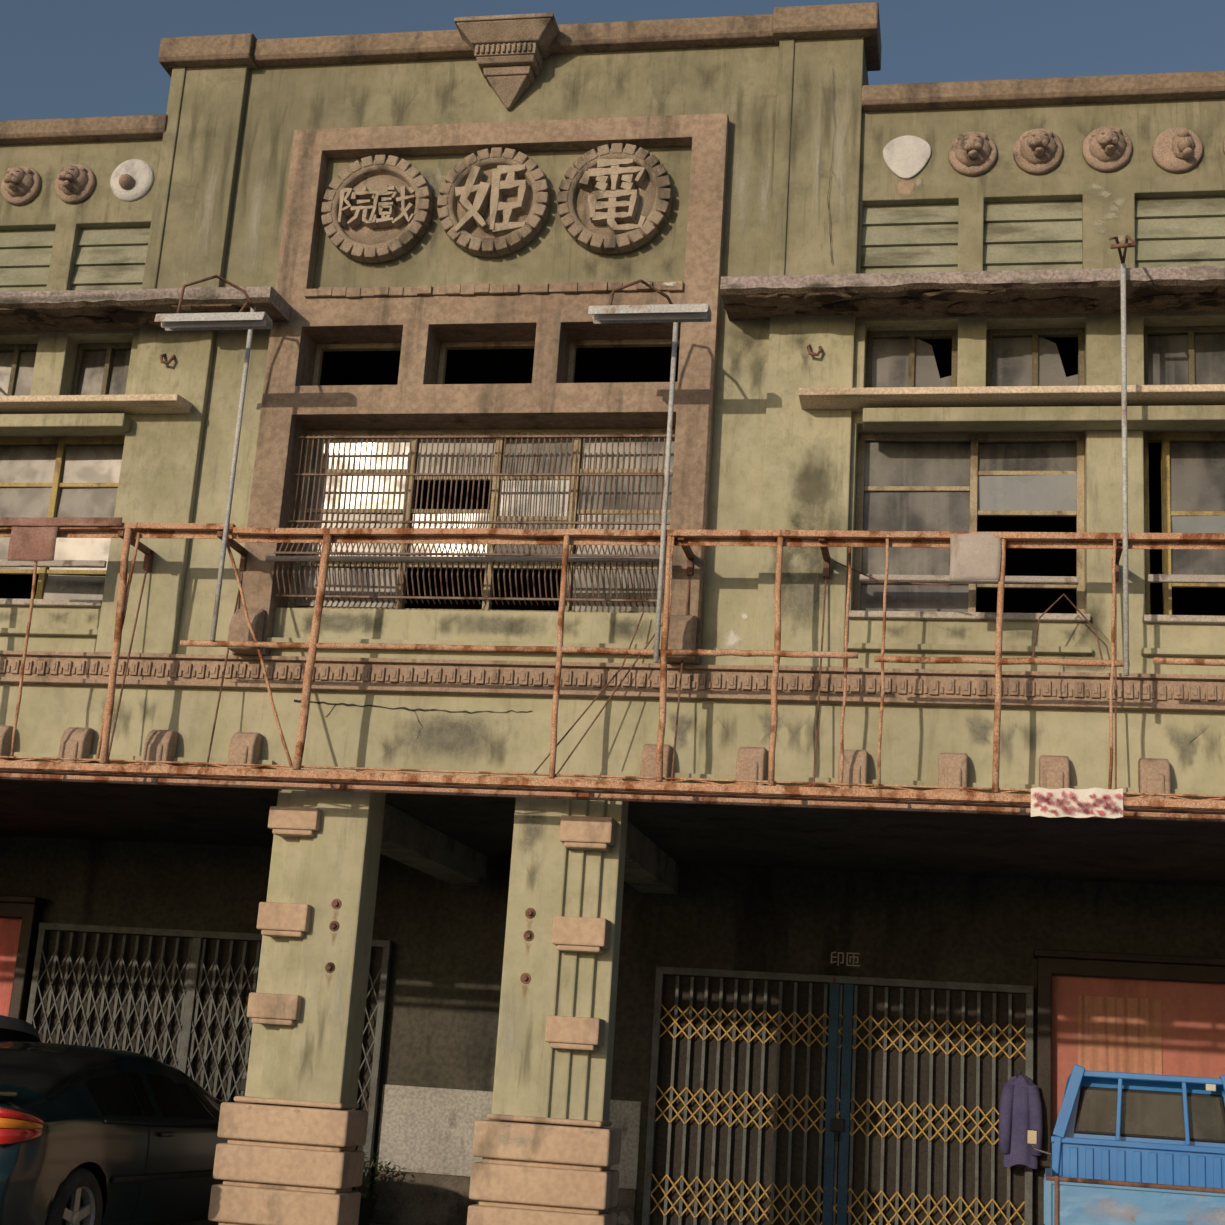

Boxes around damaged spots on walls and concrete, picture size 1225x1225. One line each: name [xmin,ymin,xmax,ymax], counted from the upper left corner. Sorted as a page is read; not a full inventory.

spalling [0,295,251,330]
spalling [922,279,1099,313]
damp [800,465,825,503]
damp [781,554,823,617]
crack [294,699,532,738]
damp [415,722,488,754]